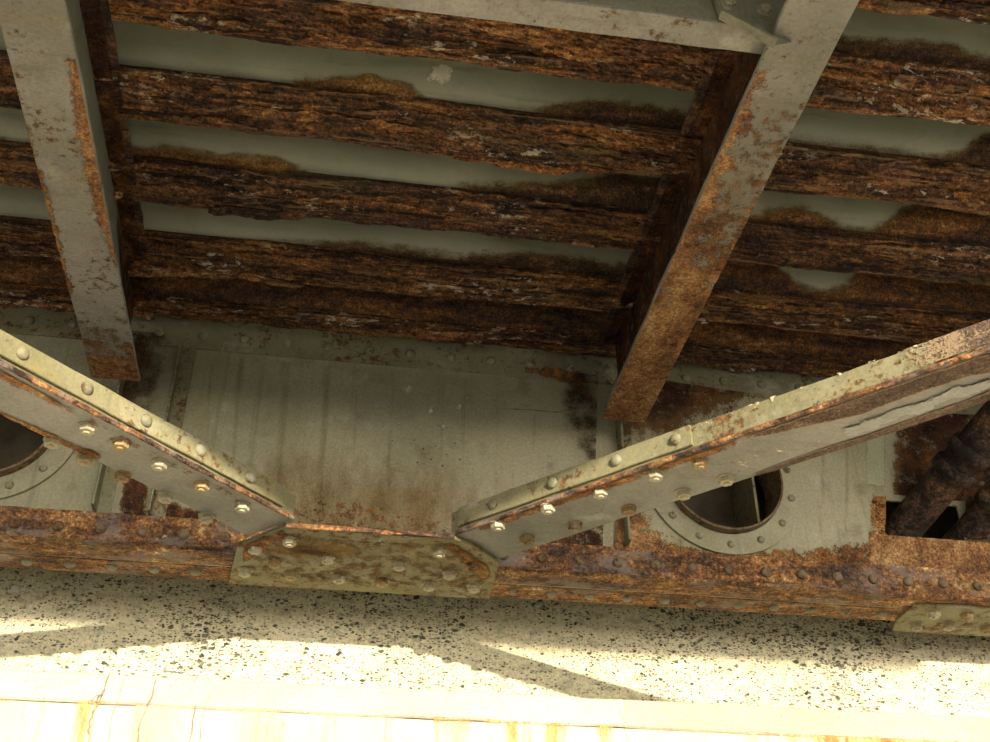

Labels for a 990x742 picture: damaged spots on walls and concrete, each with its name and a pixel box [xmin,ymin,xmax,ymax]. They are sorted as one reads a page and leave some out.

corrosion [0,0,990,461]
peeling [743,354,990,439]
peeling [739,391,990,477]
corrosion [119,479,148,515]
corrosion [166,502,200,519]
corrosion [294,486,446,533]
corrosion [479,442,736,530]
corrosion [551,512,715,554]
corrosion [748,414,990,572]
crack [87,674,124,742]
crack [137,679,157,742]
crack [189,694,210,742]